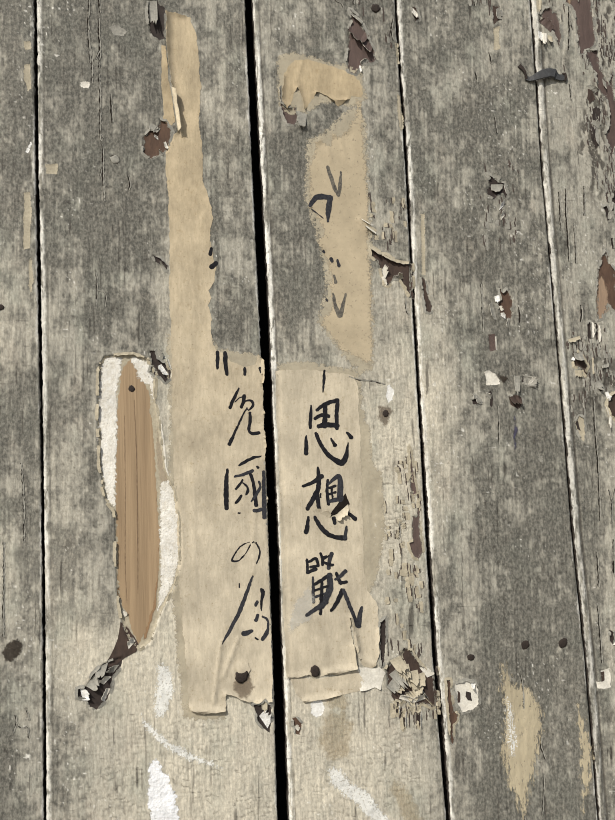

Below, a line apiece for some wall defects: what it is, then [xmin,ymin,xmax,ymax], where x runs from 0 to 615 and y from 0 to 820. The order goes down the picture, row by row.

peeling [344,0,379,76]
peeling [140,118,175,159]
peeling [536,0,615,236]
peeling [362,192,433,315]
peeling [489,287,514,327]
peeling [566,248,615,441]
peeling [75,348,182,710]
peeling [384,444,425,613]
peeling [378,613,481,745]